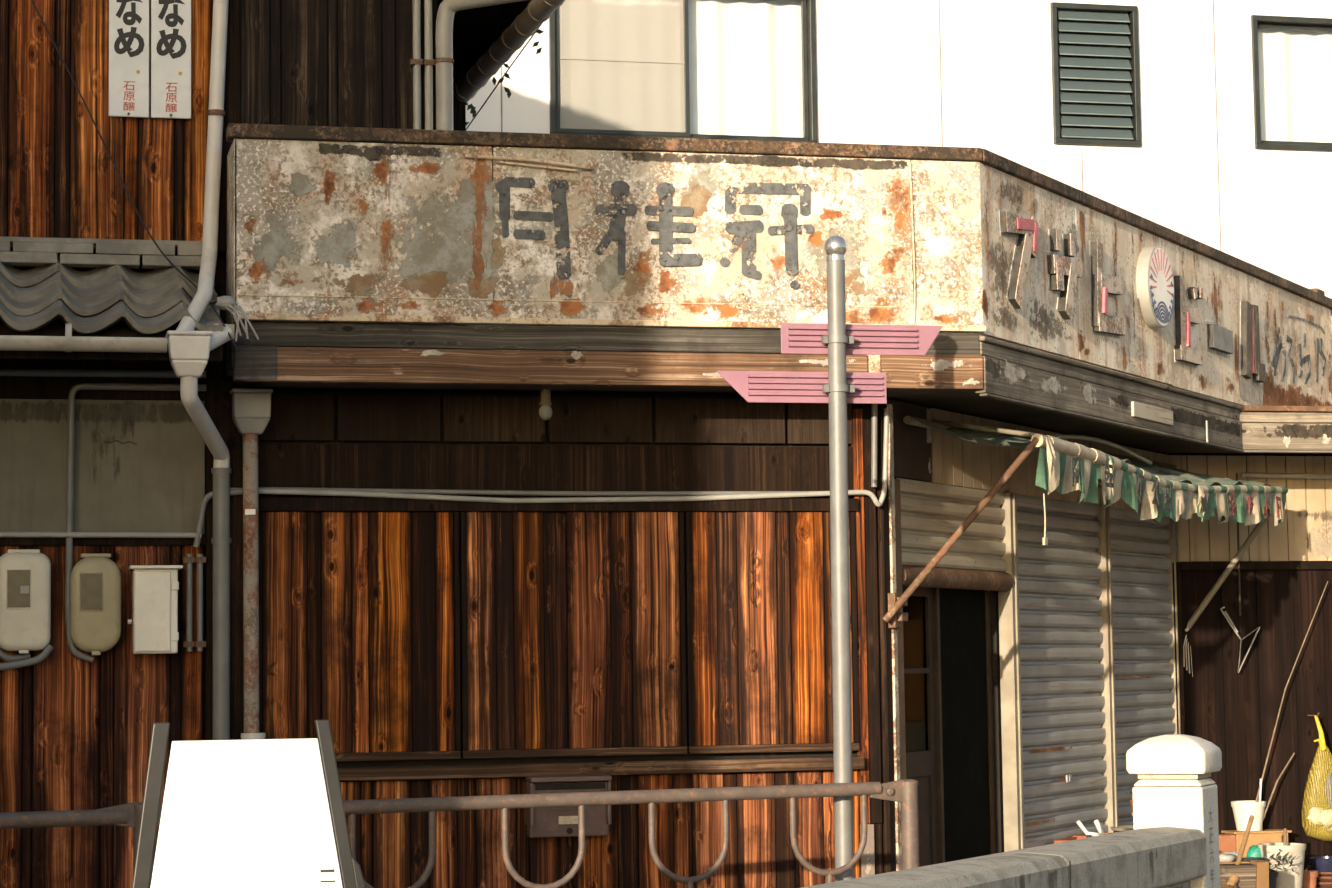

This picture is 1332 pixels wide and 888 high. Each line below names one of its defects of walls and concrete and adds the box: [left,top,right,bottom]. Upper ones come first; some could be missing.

peeling [1000,181,1023,212]
peeling [252,172,383,297]
peeling [393,177,506,301]
rust [807,208,849,247]
rust [878,178,911,283]
rust [546,273,587,316]
peeling [592,249,651,296]
rust [846,292,904,324]
rust [920,305,959,324]
peeling [987,242,1071,342]
rust [1242,301,1332,412]
peeling [999,358,1119,410]